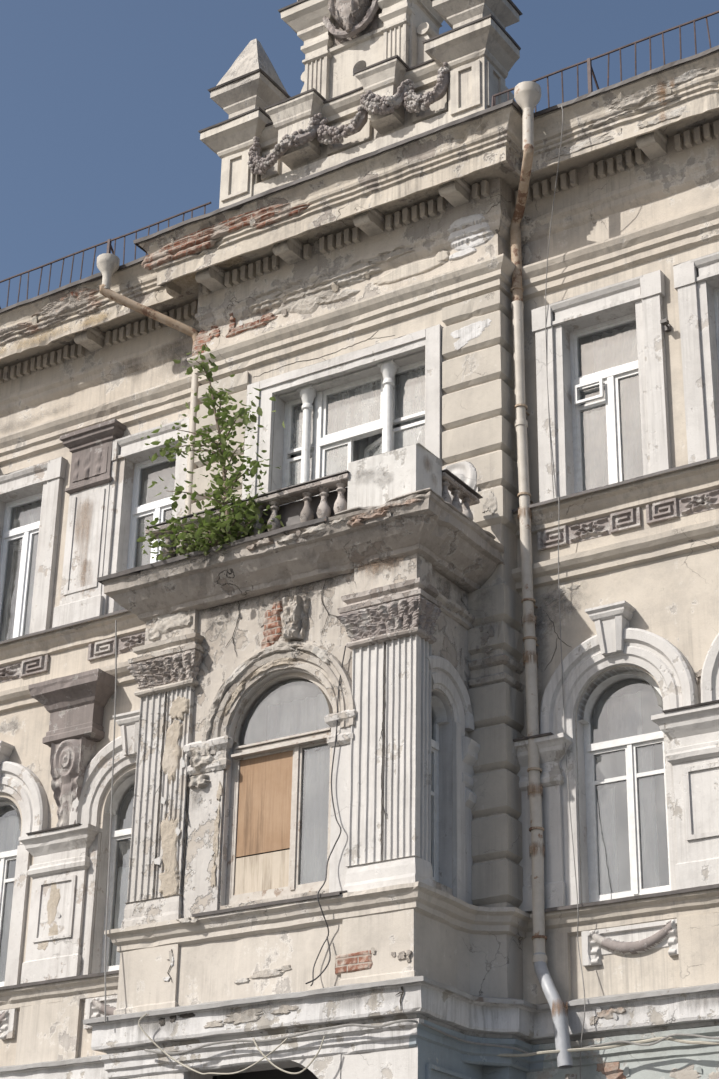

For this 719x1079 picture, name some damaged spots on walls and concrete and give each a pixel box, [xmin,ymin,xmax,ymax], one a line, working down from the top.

flaking render [192,246,415,356]
peeling [450,319,492,351]
flaking render [162,601,333,888]
crack [378,643,386,854]
peeling [154,816,182,898]
flaking render [335,947,375,975]
peeling [595,1062,630,1079]